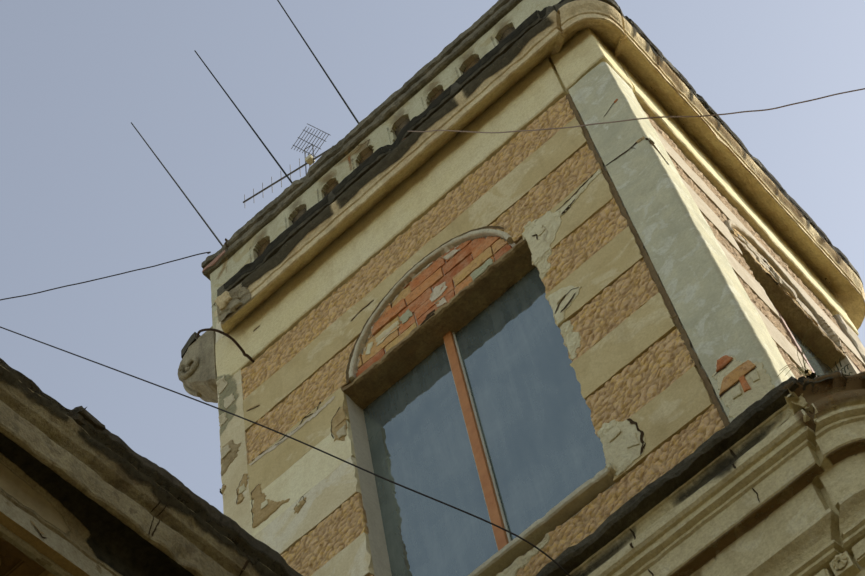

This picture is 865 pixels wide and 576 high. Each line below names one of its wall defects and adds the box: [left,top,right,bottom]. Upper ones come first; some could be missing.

leakage [223,0,564,289]
leakage [0,358,69,421]
leakage [0,432,194,576]
leakage [79,421,289,576]
flaking render [216,375,306,528]
spalling [547,285,582,361]
flaking render [700,355,775,419]
flaking render [774,389,808,430]